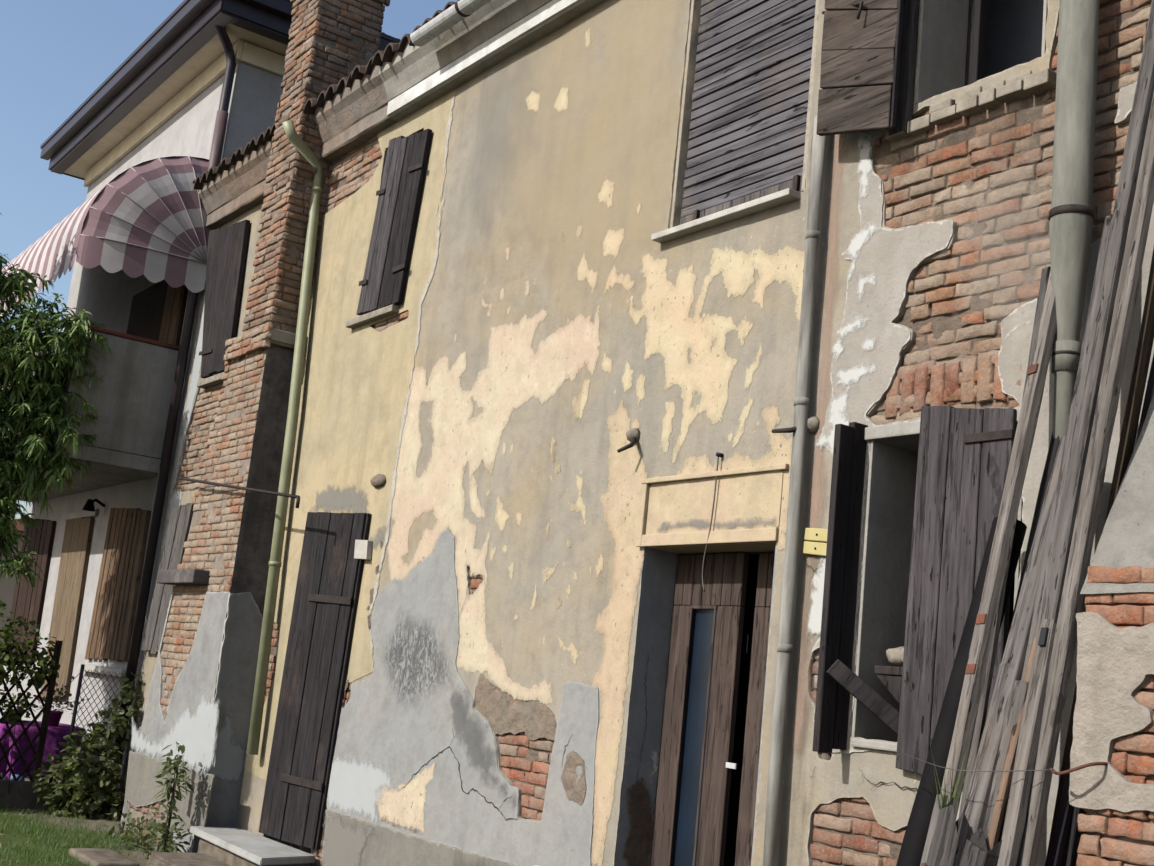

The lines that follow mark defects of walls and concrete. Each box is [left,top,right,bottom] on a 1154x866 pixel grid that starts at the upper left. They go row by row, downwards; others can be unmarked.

flaking render [325,136,382,213]
peeling [366,90,805,866]
flaking render [816,88,1056,456]
peeling [1018,351,1054,587]
flaking render [1079,0,1152,348]
peeling [1089,203,1154,566]
water stain [390,629,441,691]
crack [401,733,514,820]
peeling [808,557,826,722]
flaking render [810,797,906,866]
crack [859,769,918,794]
peeling [1036,640,1078,866]